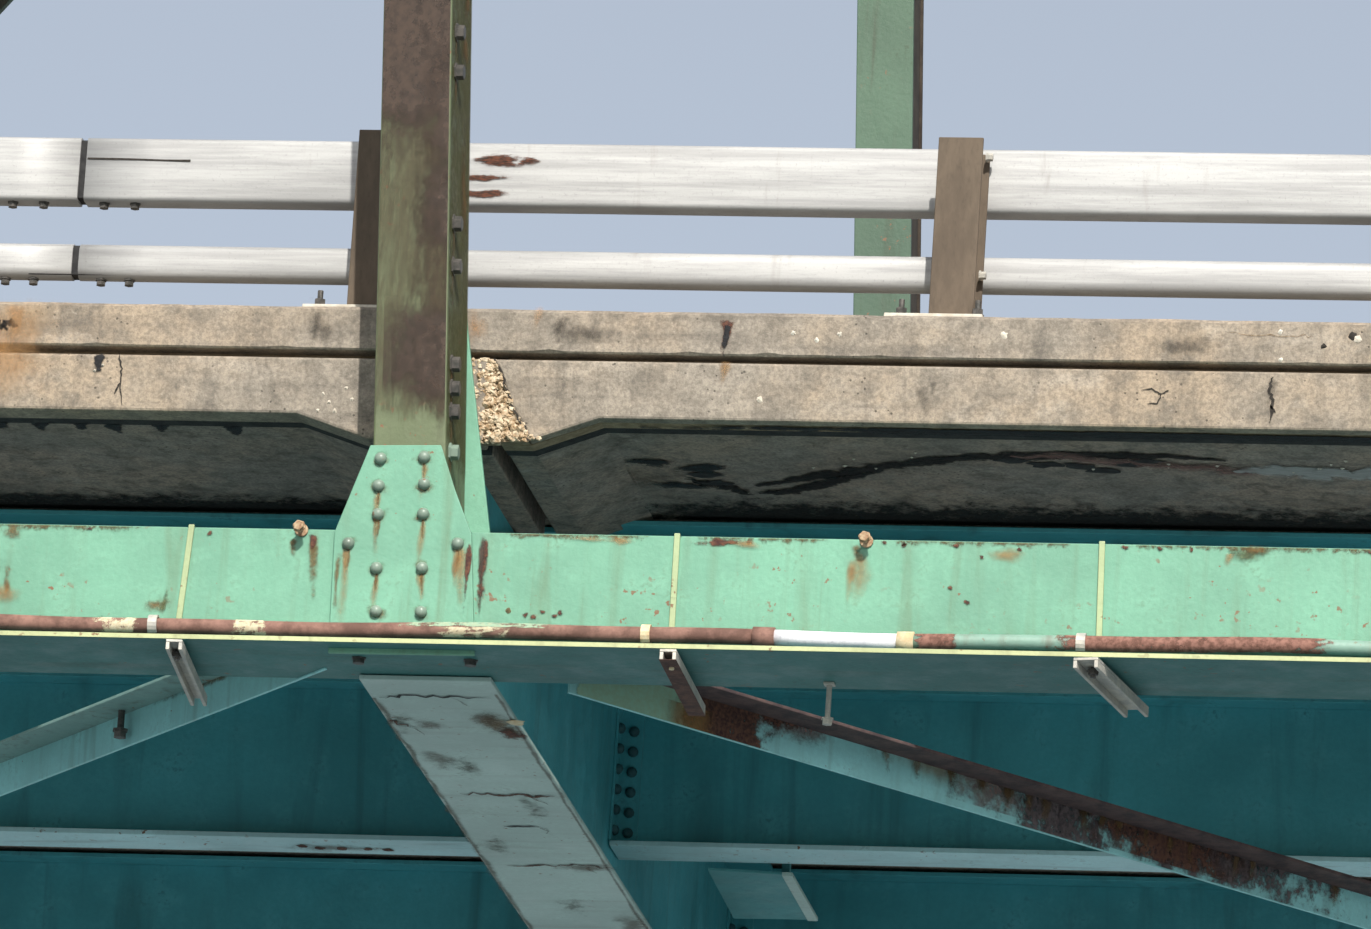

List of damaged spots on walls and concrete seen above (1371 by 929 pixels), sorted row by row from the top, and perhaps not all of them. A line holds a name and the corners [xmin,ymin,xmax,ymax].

rust [382,0,540,222]
spalling [472,357,542,446]
crack [1267,377,1275,423]
leakage [1233,465,1371,480]
rust [290,535,318,575]
rust [454,540,488,605]
rust [698,538,752,546]
rust [1229,548,1264,559]
rust [914,634,956,649]
rust [1058,635,1334,654]
rust [659,659,823,748]
rust [914,762,1340,913]